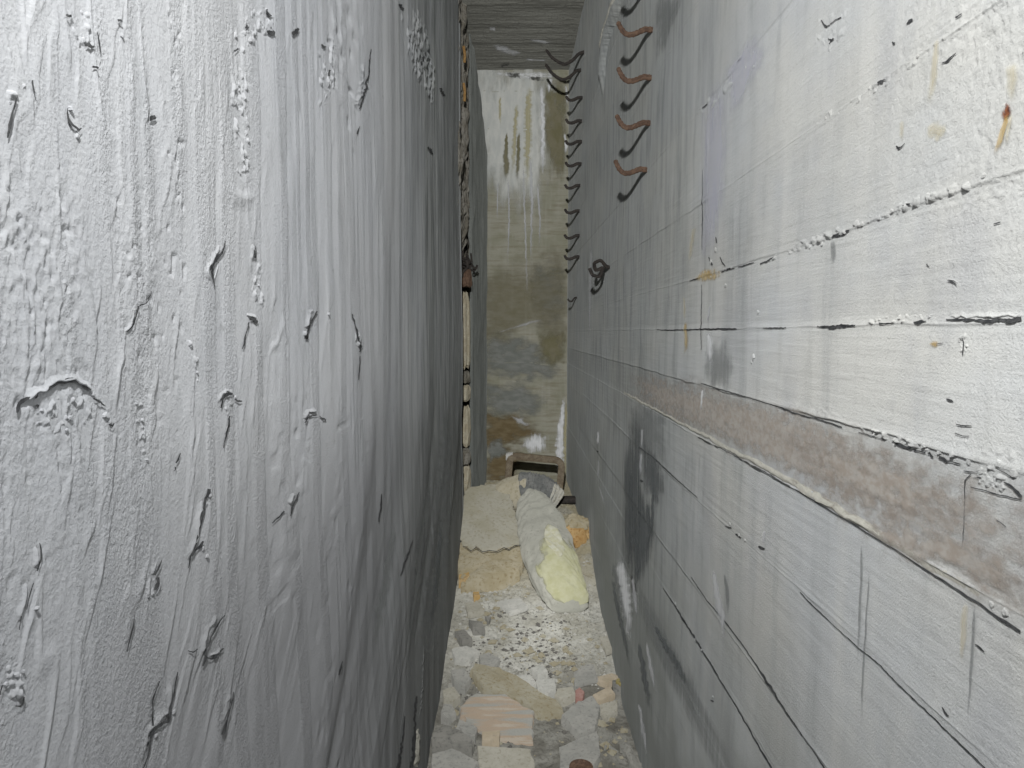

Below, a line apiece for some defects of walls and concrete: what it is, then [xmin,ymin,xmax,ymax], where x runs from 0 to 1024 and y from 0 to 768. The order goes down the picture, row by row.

water stain [498,64,568,175]
rust [997,104,1010,145]
crack [657,285,737,334]
crack [817,311,1021,330]
flaking render [16,372,114,434]
water stain [636,377,1010,593]
water stain [613,430,664,697]